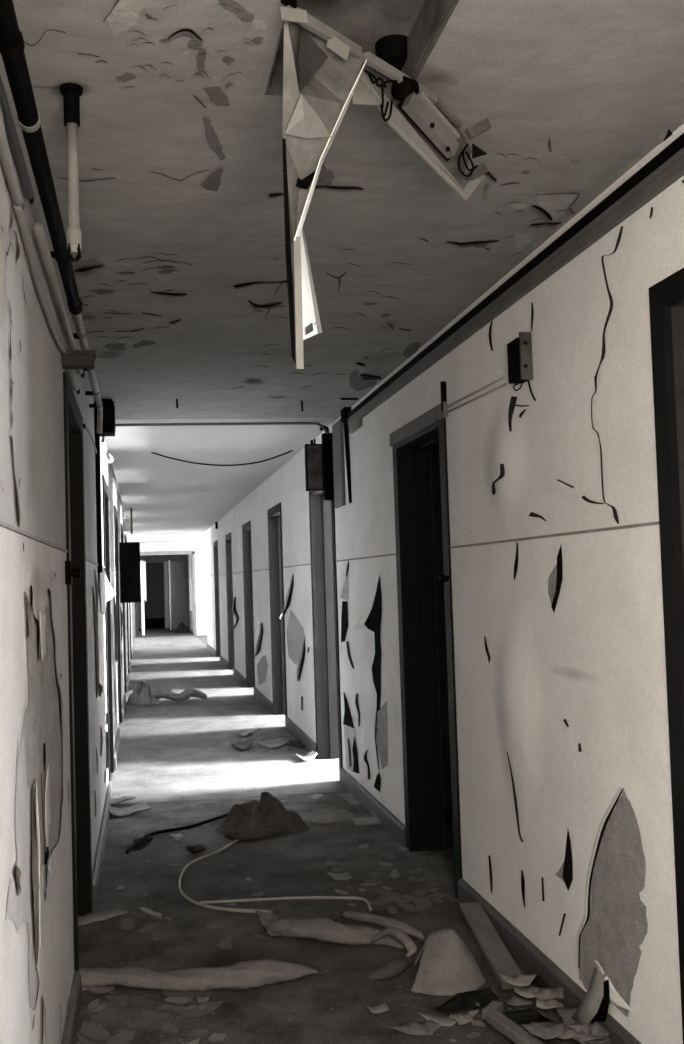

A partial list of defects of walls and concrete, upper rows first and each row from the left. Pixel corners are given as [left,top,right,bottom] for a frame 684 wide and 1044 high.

crack [6,181,26,423]
peeling [116,28,241,192]
peeling [213,0,266,46]
crack [420,238,500,251]
crack [483,171,519,186]
crack [557,226,623,524]
peeling [92,565,123,781]
flaking render [280,578,305,665]
peeling [340,560,388,792]
peeling [548,564,557,606]
peeling [6,586,64,1044]
peeling [576,786,648,1017]